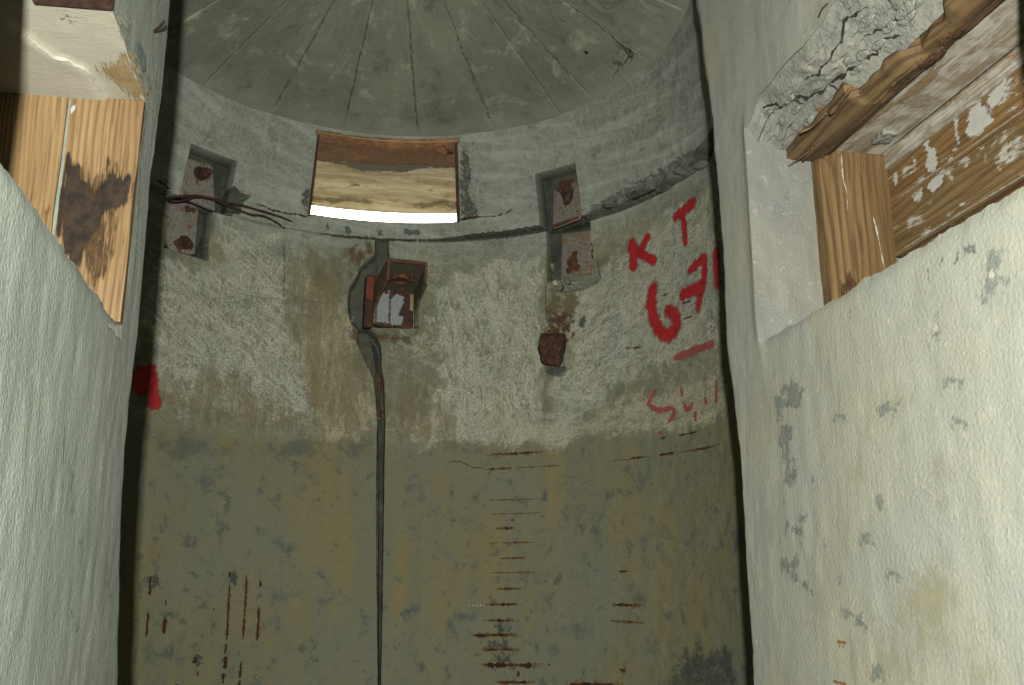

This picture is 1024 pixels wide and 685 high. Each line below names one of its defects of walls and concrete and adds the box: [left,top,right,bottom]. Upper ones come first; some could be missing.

crack [757,6,901,142]
spalling [751,0,955,150]
peeling [953,78,1018,150]
spalling [582,151,711,214]
peeling [911,139,966,202]
rust [486,451,559,470]
rust [145,600,167,636]
rust [213,571,262,685]
rust [469,587,550,685]
water stain [672,643,737,685]